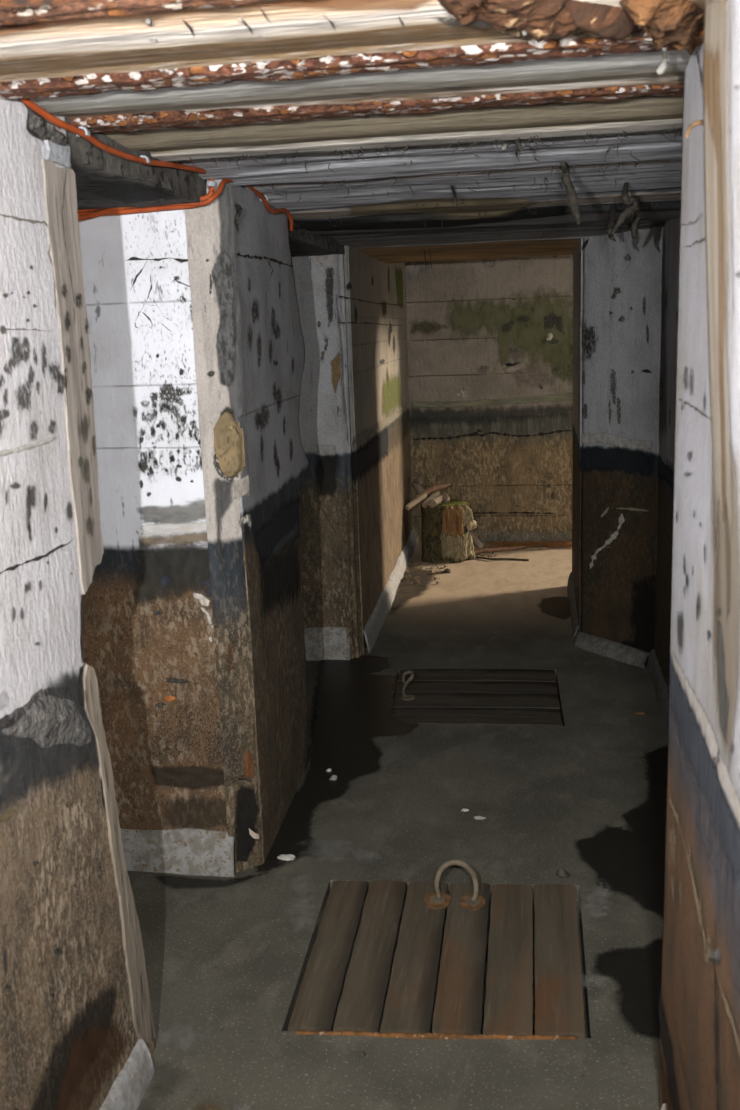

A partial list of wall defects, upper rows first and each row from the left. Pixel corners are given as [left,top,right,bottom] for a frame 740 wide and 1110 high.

rust [0,8,220,36]
rust [236,0,428,10]
spalling [434,0,704,56]
crack [0,168,75,332]
crack [126,257,190,332]
water stain [133,183,300,642]
water stain [316,282,597,589]
crack [679,399,711,420]
rust [703,0,740,765]
crack [0,539,73,574]
water stain [0,674,99,821]
water stain [33,988,125,1110]